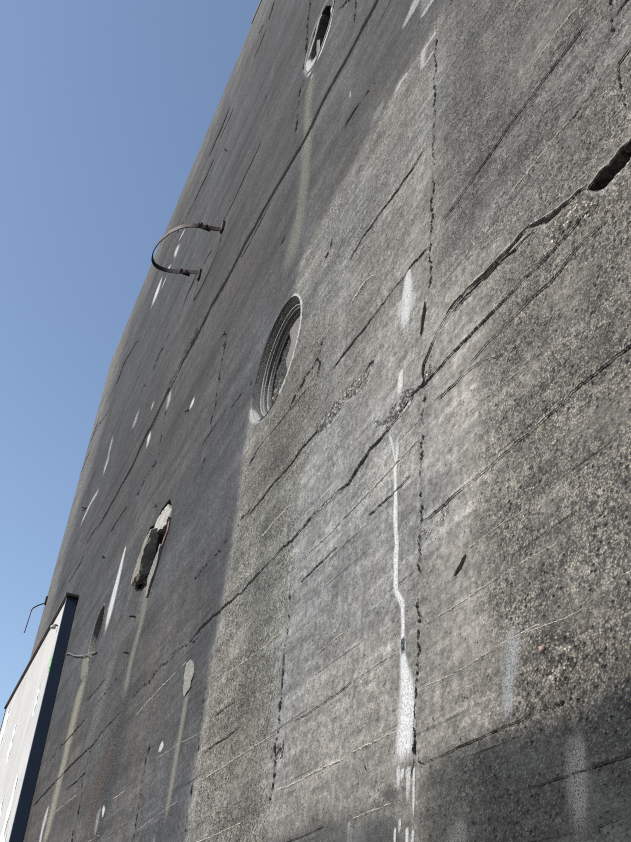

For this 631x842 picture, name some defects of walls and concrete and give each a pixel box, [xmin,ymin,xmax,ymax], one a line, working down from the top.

crack [73,0,387,575]
crack [133,0,631,697]
crack [33,714,118,842]
spalling [146,504,172,598]
crack [184,701,234,842]
crack [266,547,349,832]
water stain [389,435,416,811]
crack [411,598,563,778]
crack [490,753,631,800]